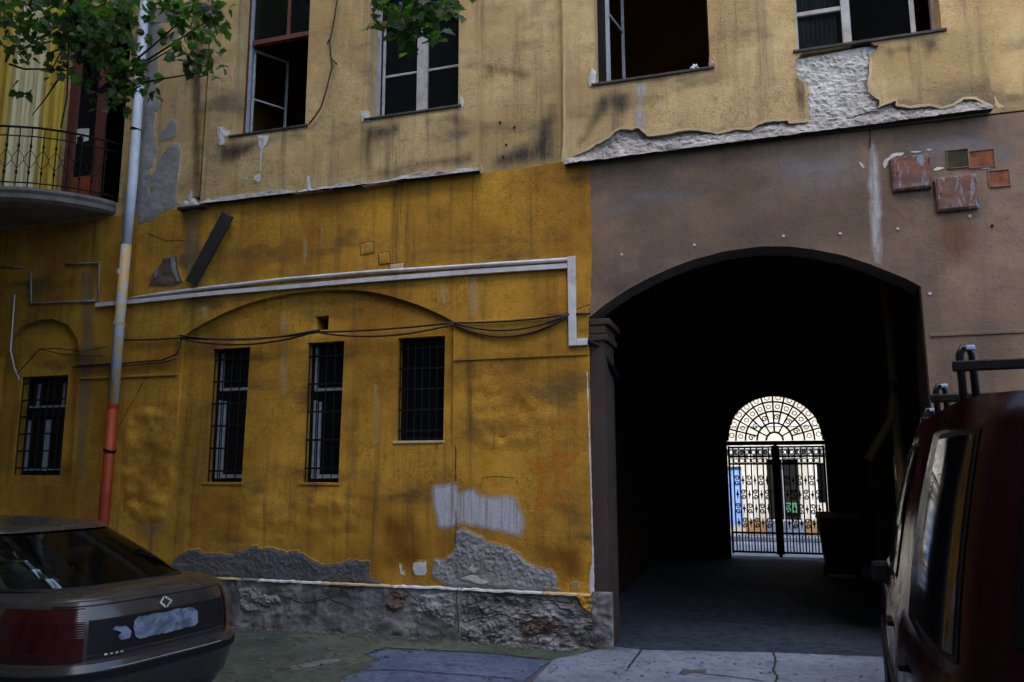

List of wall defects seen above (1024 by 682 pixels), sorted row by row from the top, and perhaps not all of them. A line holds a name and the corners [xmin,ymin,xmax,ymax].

flaking render [136,7,483,225]
damp [498,120,551,162]
damp [598,85,655,126]
spalling [561,0,1004,167]
damp [869,127,881,258]
flaking render [169,371,594,626]